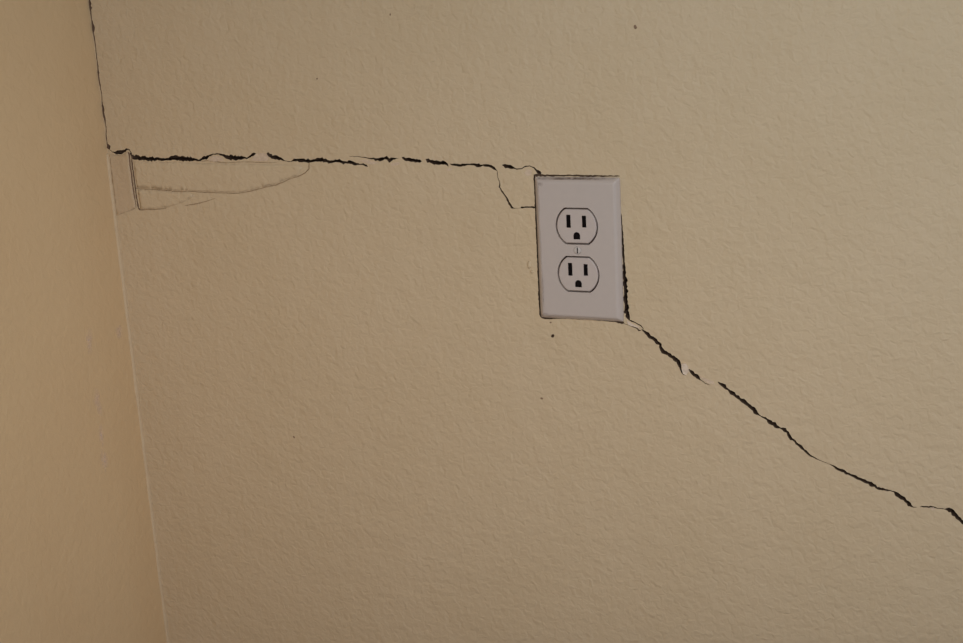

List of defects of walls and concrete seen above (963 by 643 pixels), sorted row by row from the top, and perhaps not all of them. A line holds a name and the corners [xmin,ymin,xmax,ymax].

crack [89,0,541,210]
crack [621,214,963,524]